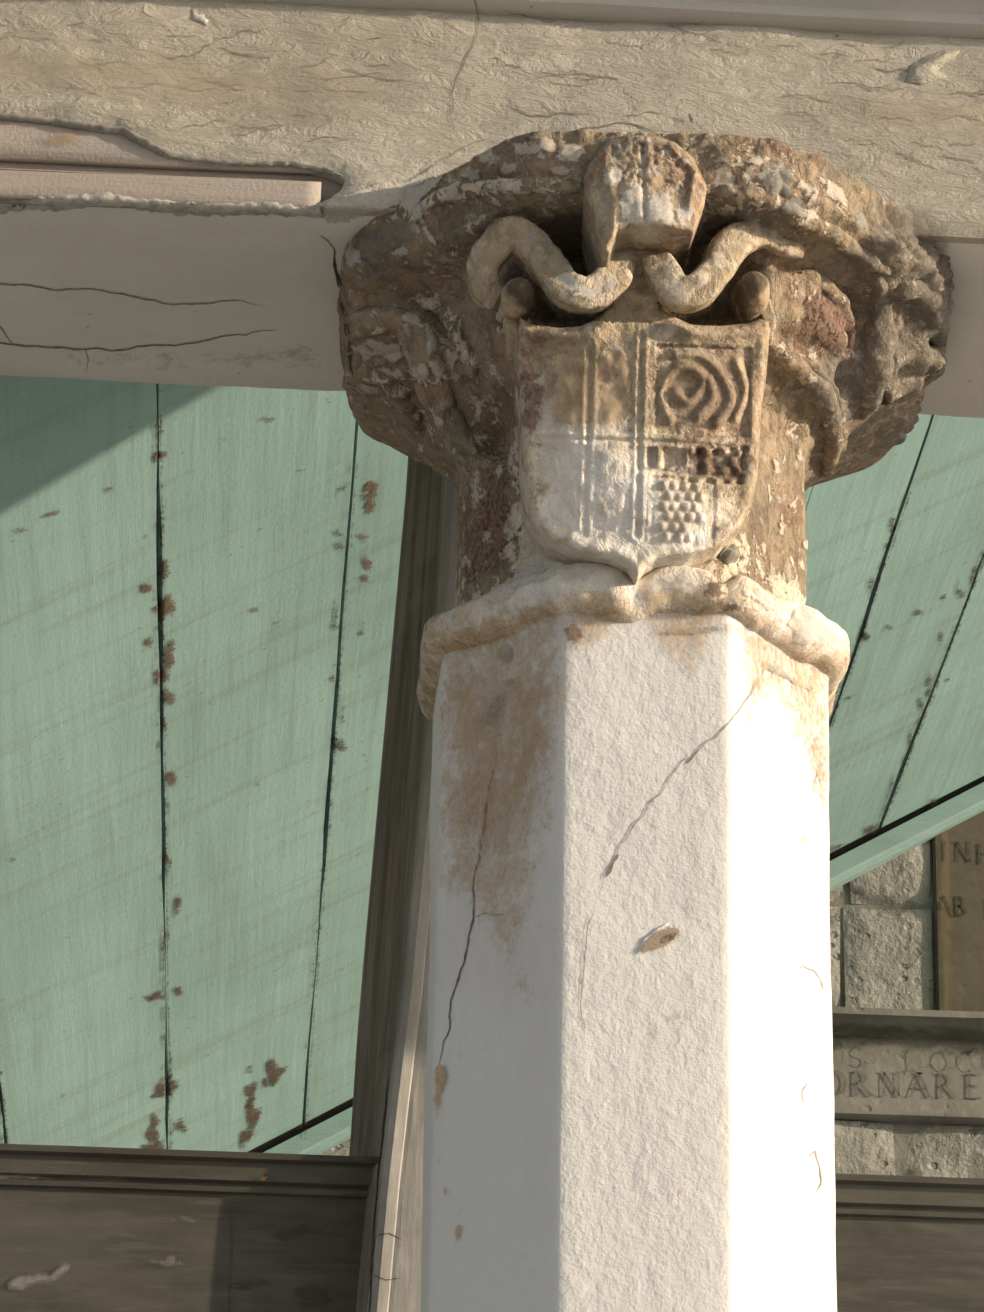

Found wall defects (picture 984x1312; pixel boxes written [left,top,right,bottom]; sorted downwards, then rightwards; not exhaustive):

flaking render [0,113,344,177]
crack [0,0,683,161]
crack [778,40,984,170]
flaking render [0,192,323,218]
crack [0,283,275,372]
peeling [141,559,176,623]
peeling [145,637,176,733]
crack [580,670,764,1034]
crack [435,756,504,1070]
spalling [637,923,681,952]
peeling [141,1073,188,1149]
crack [368,1079,403,1312]